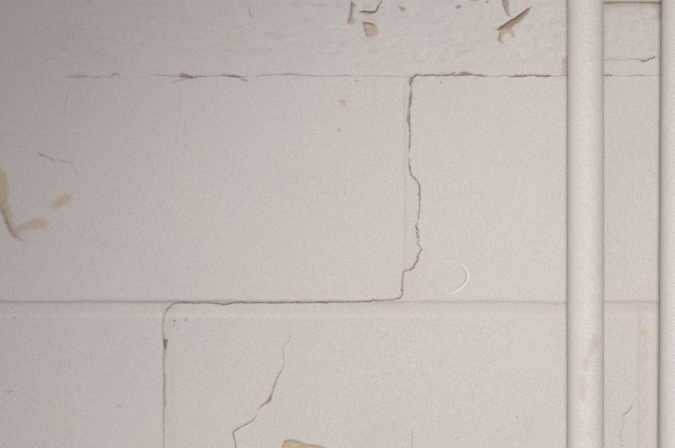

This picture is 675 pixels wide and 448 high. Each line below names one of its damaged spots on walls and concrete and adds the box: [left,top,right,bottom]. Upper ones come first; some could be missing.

peeling [497,5,531,41]
crack [407,72,484,147]
crack [169,213,420,308]
peeling [283,439,323,448]